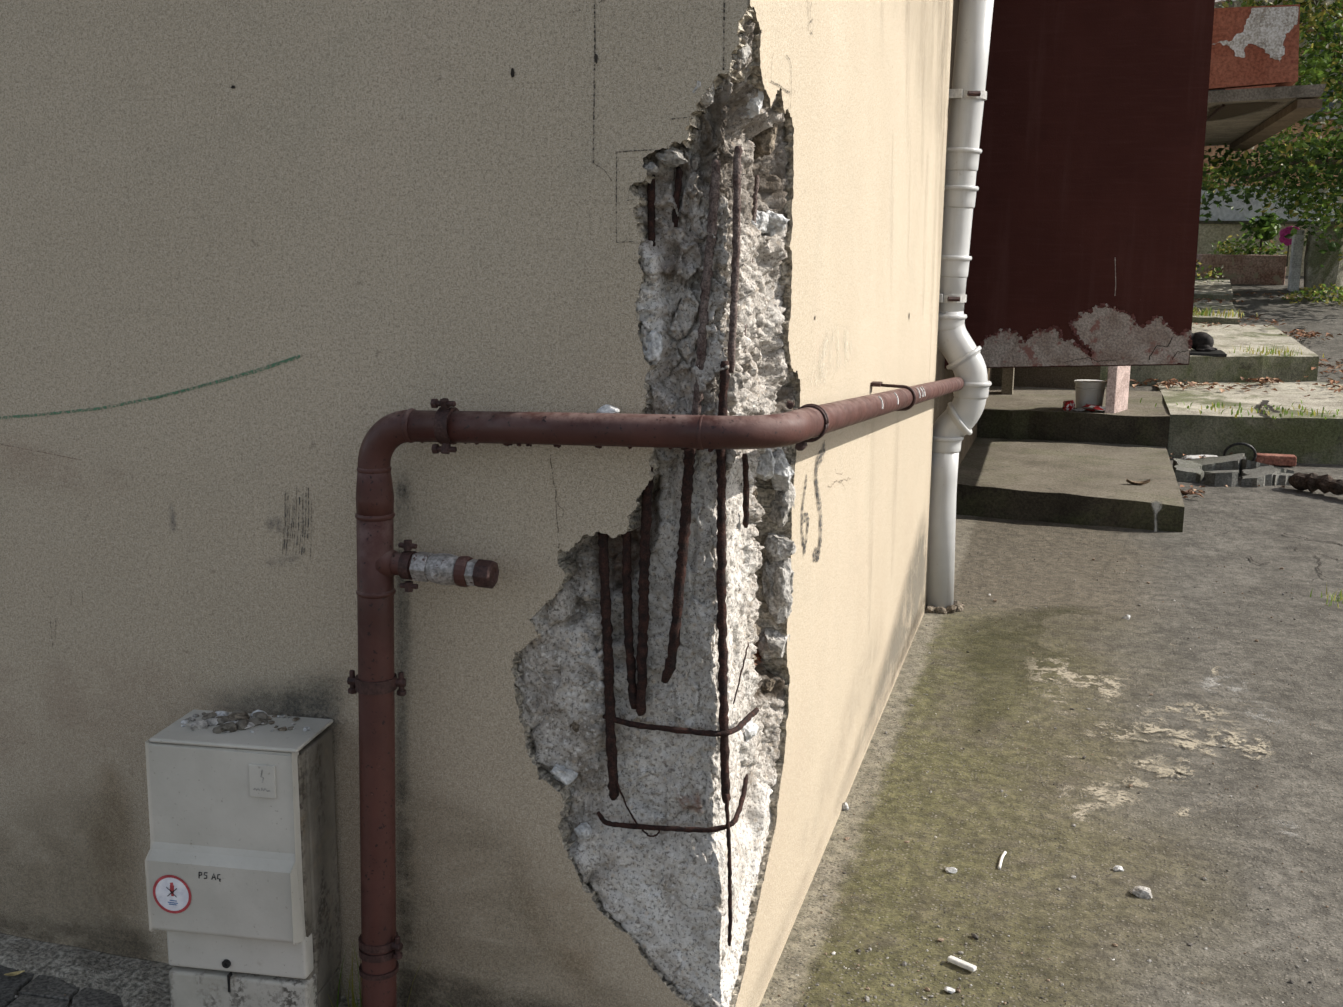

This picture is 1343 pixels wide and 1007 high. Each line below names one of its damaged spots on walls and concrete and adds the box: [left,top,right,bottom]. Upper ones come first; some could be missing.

spalling [629,5,801,416]
peeling [980,303,1192,367]
peeling [1214,6,1299,62]
spalling [511,444,796,1007]